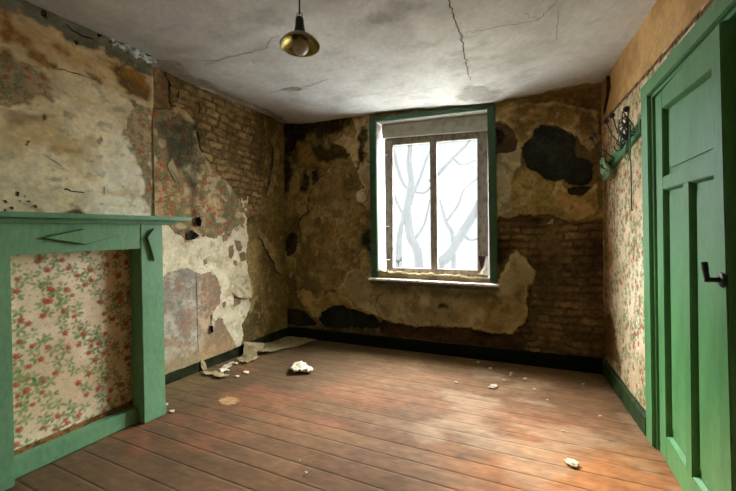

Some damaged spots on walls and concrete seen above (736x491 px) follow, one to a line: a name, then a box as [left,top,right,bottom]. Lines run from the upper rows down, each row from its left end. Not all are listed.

spalling [111,38,371,347]
water stain [284,117,368,193]
flaking render [379,101,605,360]
crack [448,0,559,80]